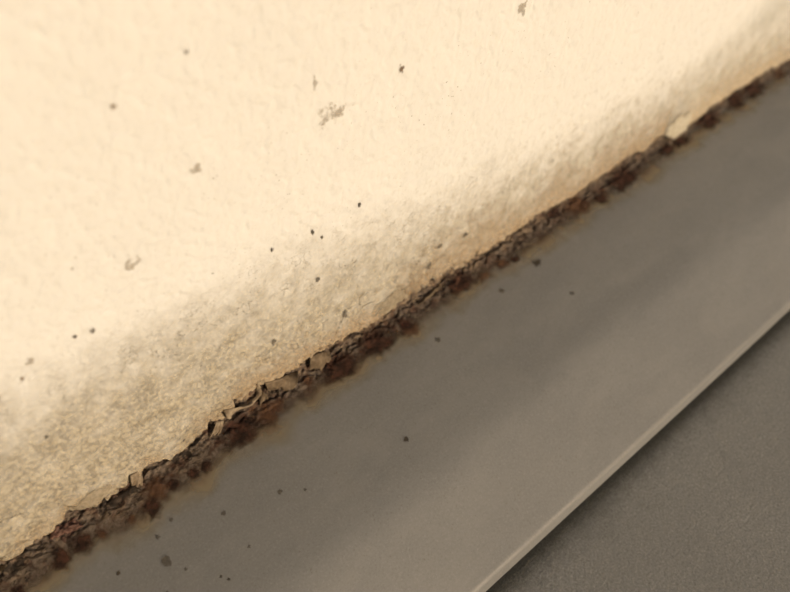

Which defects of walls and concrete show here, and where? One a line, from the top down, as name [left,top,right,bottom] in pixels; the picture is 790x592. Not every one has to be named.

corrosion [696,56,790,129]
corrosion [0,111,715,592]
peeling [48,517,83,542]